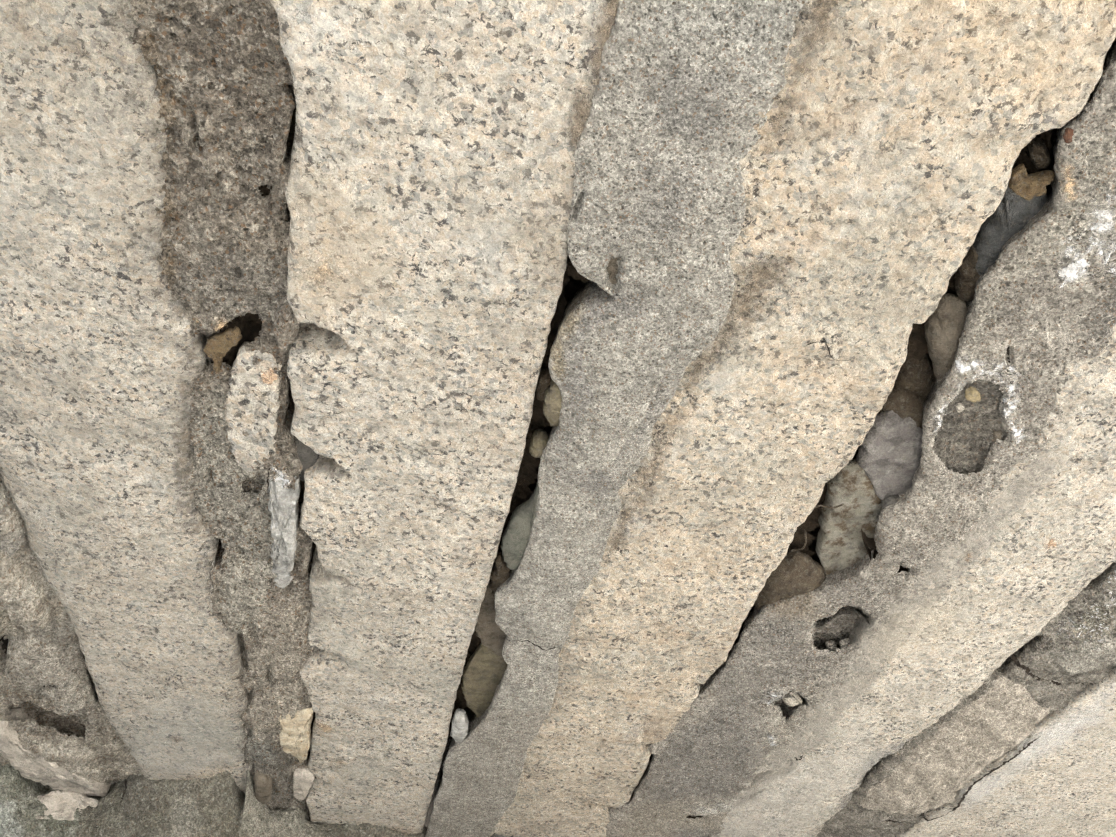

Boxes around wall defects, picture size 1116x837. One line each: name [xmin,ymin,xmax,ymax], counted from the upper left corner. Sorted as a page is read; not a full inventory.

crack [286,94,296,147]
crack [1012,129,1053,174]
crack [945,273,956,294]
water stain [1061,250,1087,282]
crack [897,322,928,376]
crack [489,256,591,582]
spalling [932,380,1009,474]
crack [297,480,305,504]
crack [787,482,827,556]
spalling [813,606,870,651]
crack [448,630,481,738]
crack [885,738,1038,823]